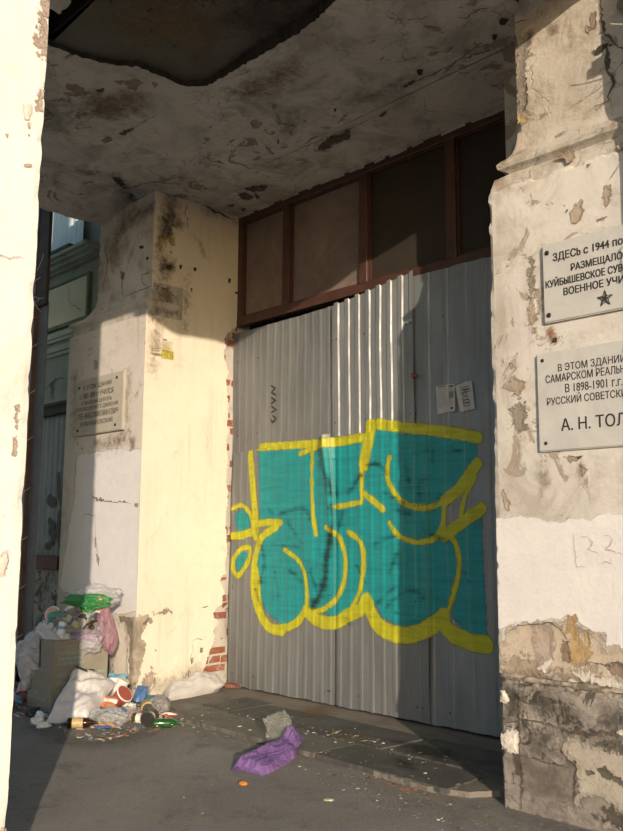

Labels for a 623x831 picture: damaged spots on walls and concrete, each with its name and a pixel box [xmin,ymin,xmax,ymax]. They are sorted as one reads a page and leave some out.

peeling [32,0,50,61]
crack [592,0,623,106]
peeling [34,87,45,111]
peeling [566,199,585,224]
peeling [597,184,612,222]
peeling [503,362,528,434]
flaking render [213,594,229,619]
flaking render [107,620,130,674]
flaking render [203,629,228,672]
water stain [506,688,524,716]
peeling [501,728,520,754]
flaking render [558,729,623,831]